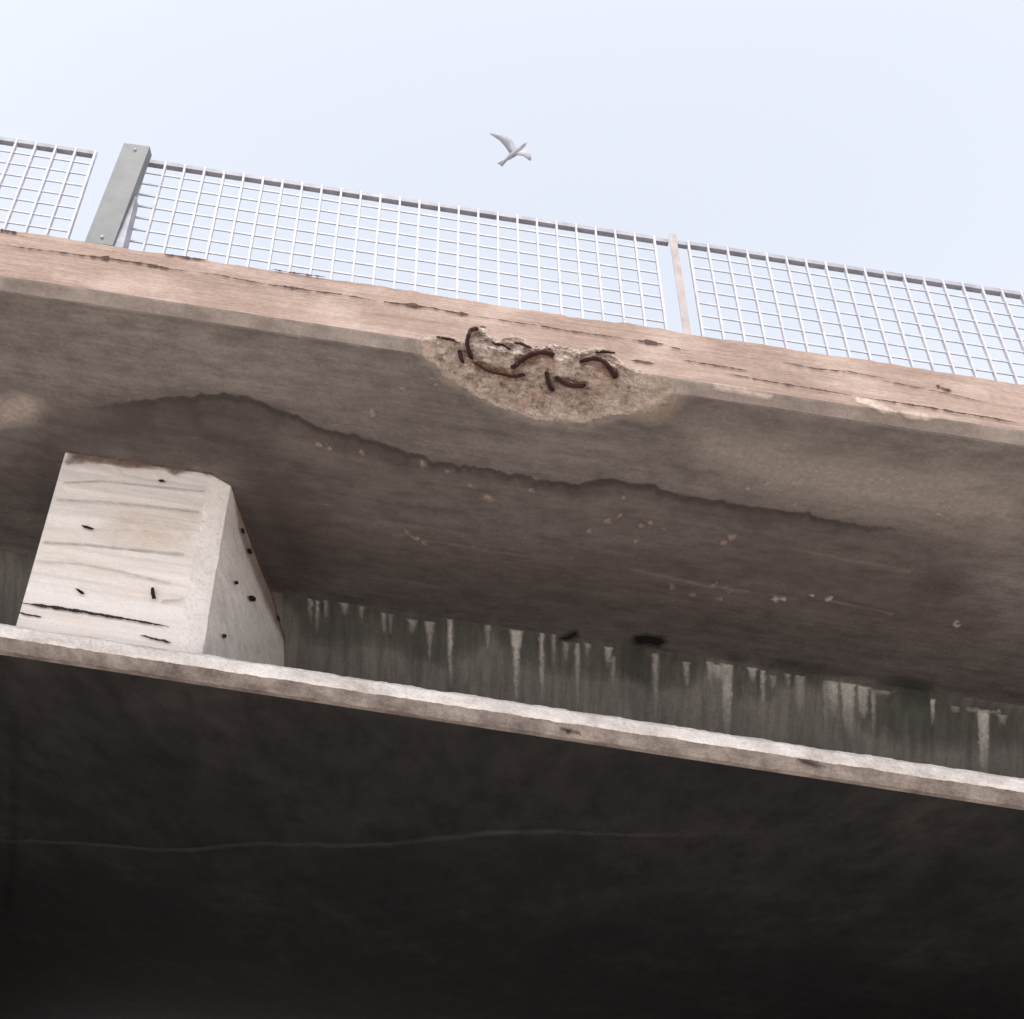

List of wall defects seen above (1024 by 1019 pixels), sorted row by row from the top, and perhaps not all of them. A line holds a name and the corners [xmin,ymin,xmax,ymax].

spalling [421,326,674,423]
leakage [408,619,434,642]
leakage [510,629,523,675]
leakage [539,633,590,683]
leakage [706,662,733,705]
leakage [747,667,804,700]
leakage [822,680,890,712]
leakage [977,709,1007,756]
crack [0,839,294,852]
crack [427,830,562,840]